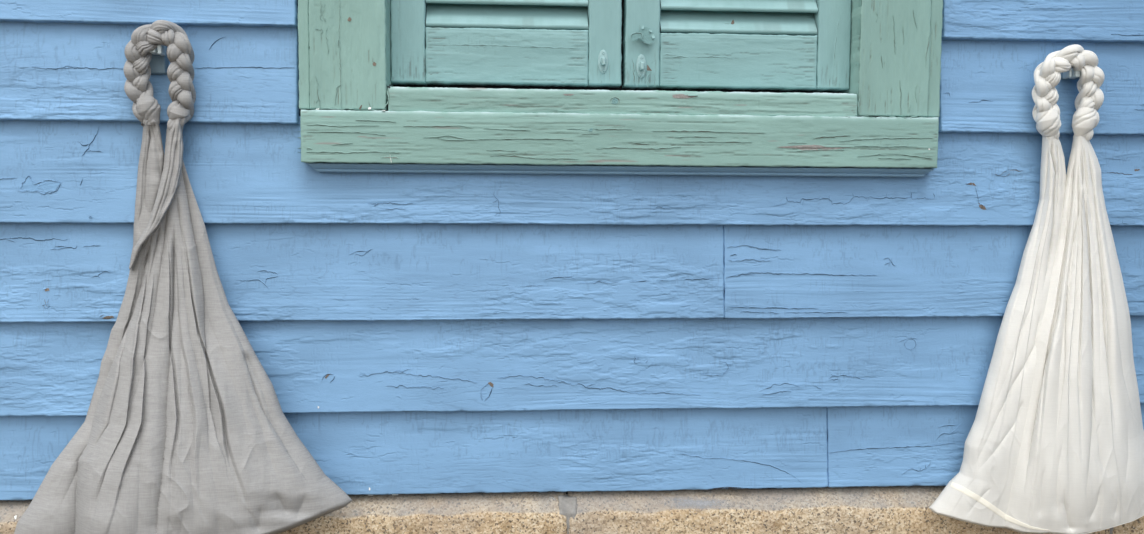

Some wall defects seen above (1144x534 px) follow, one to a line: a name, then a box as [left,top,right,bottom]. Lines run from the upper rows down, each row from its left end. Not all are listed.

peeling [780,142,851,151]
crack [775,192,935,206]
crack [363,361,730,396]